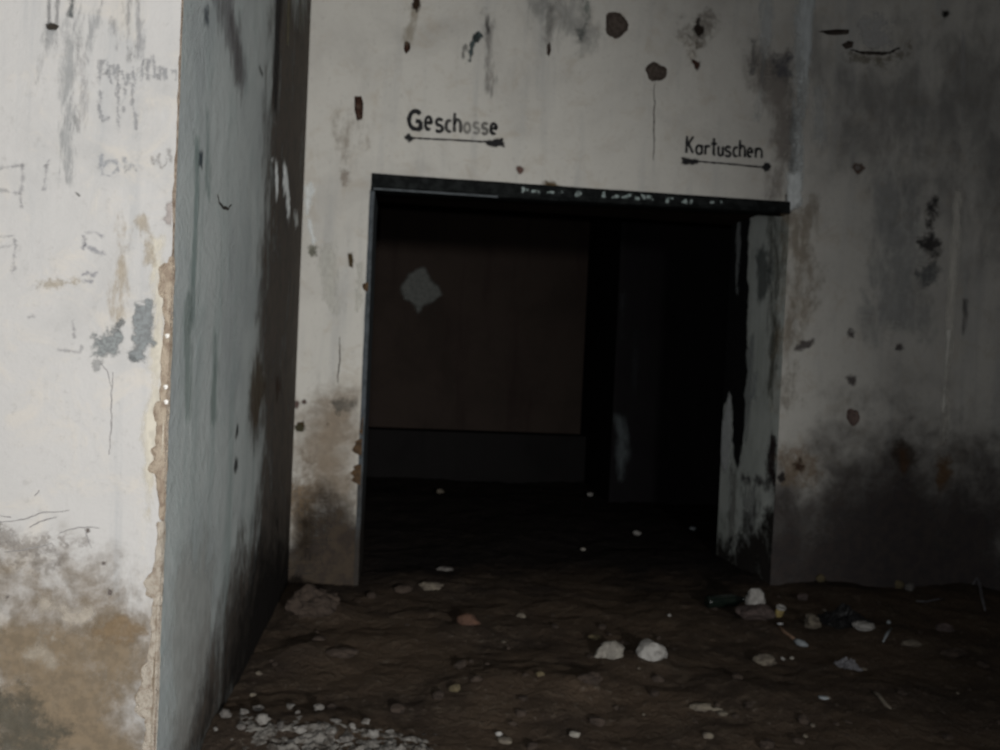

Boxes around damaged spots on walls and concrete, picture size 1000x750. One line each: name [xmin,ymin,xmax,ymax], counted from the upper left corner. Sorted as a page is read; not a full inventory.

spalling [92,256,175,750]